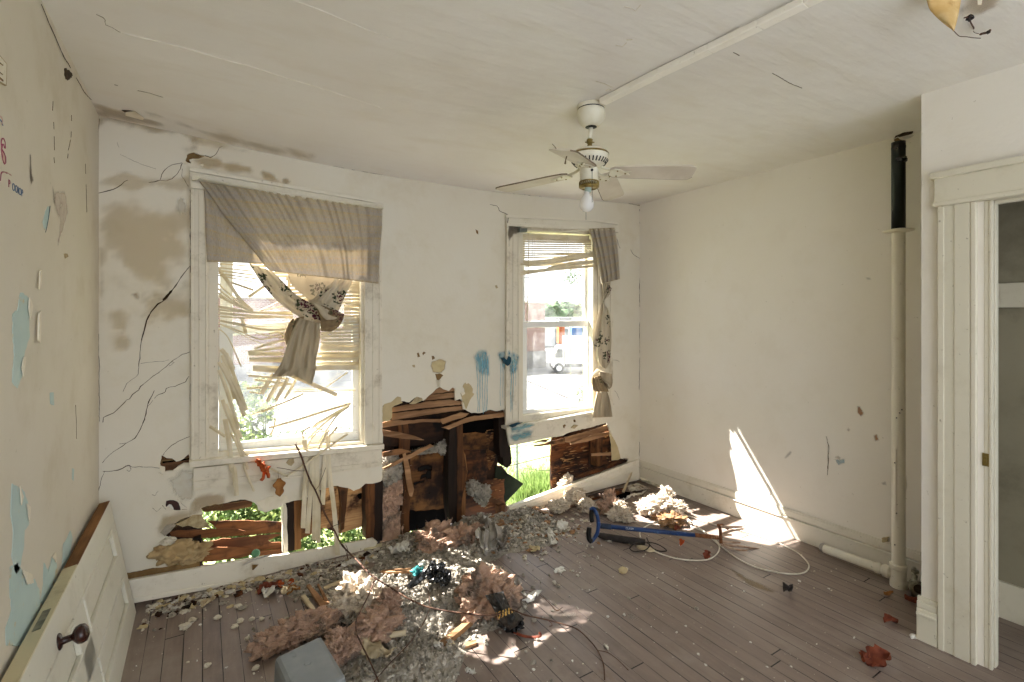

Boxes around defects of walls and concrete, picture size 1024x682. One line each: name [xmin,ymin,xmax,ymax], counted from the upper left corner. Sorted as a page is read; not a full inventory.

crack [52,107,191,488]
peeling [12,270,42,388]
spalling [382,396,424,422]
spalling [461,381,474,409]
spalling [609,432,621,460]
spalling [159,454,189,476]
spalling [257,495,289,512]
spalling [160,515,211,536]
peeling [5,484,73,647]